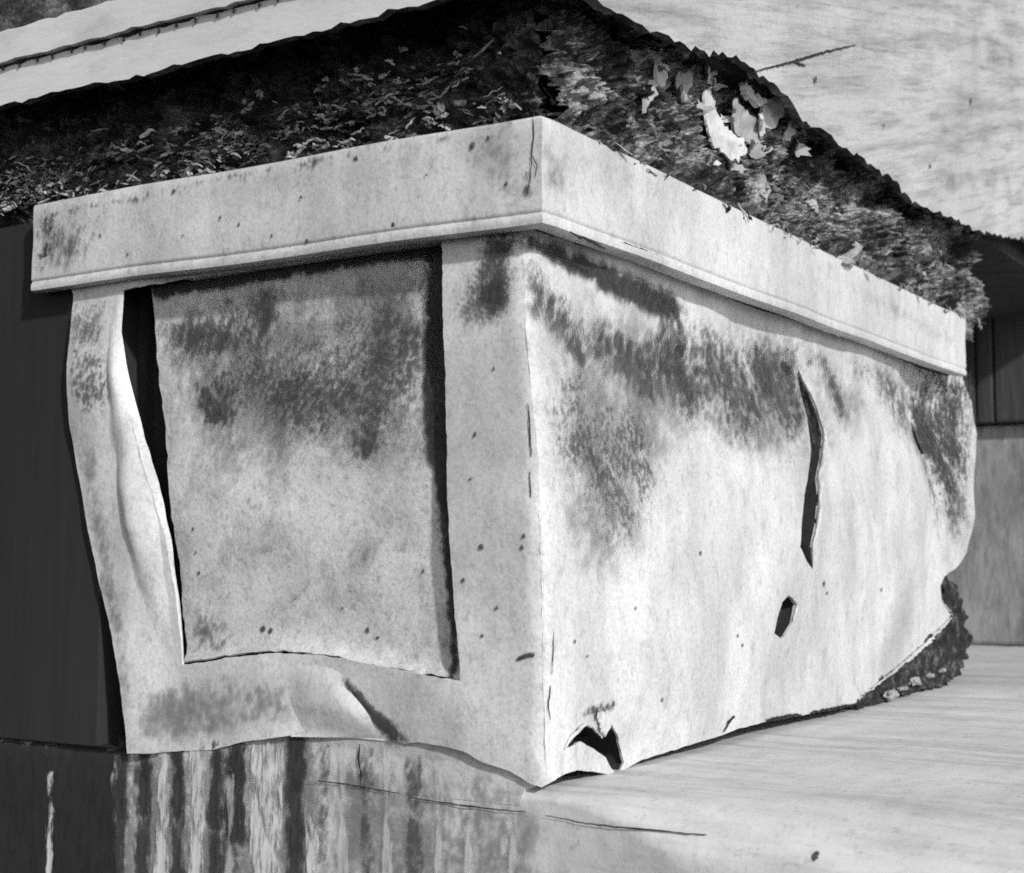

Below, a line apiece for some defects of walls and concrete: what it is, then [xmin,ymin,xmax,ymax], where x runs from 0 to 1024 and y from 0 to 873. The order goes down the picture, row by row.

crack [528,114,538,190]
peeling [641,60,811,174]
damp [462,232,846,442]
damp [152,246,459,679]
damp [557,381,653,535]
damp [878,364,973,535]
damp [0,736,328,873]
damp [361,751,374,873]
damp [405,757,424,873]